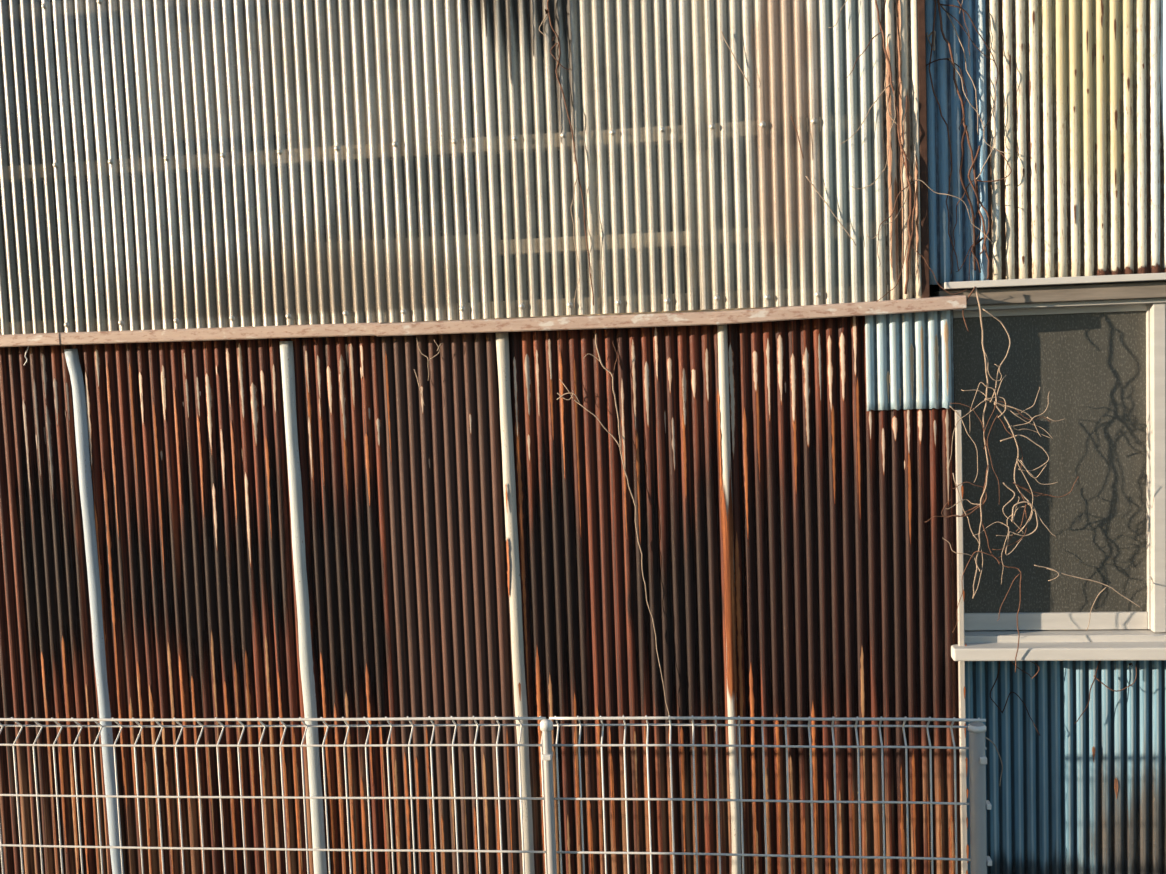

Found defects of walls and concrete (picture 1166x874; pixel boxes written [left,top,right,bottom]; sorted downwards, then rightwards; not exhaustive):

corrosion [1065,0,1116,65]
corrosion [1115,73,1132,129]
corrosion [1013,108,1036,177]
corrosion [1094,152,1124,211]
corrosion [1097,254,1166,276]
corrosion [0,316,969,874]
leakage [989,764,1166,874]